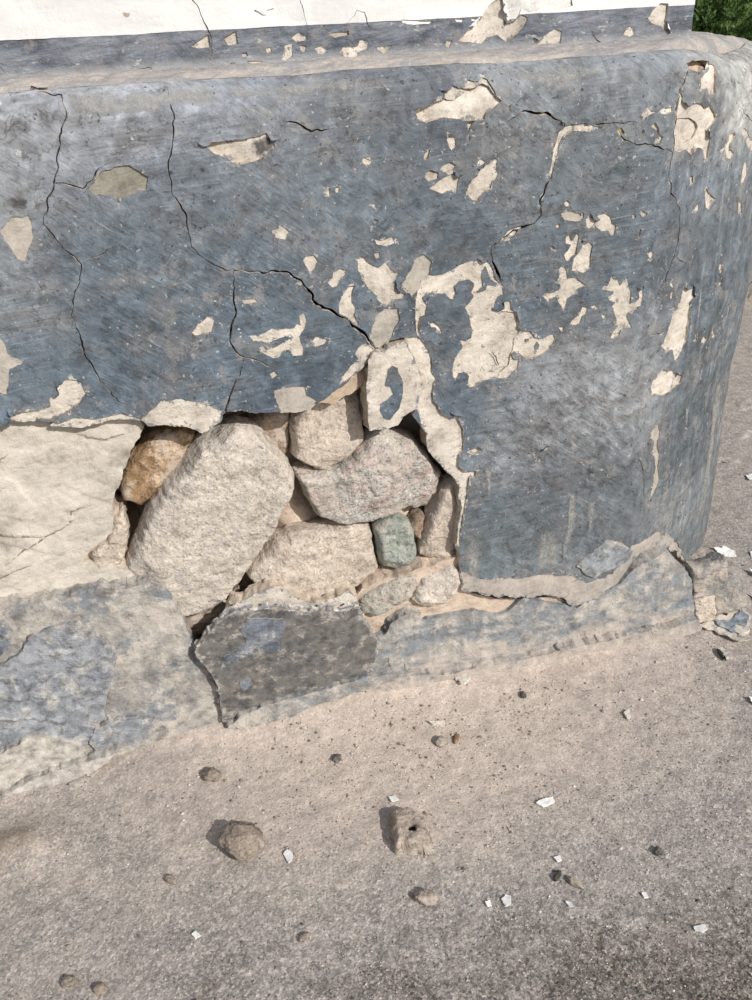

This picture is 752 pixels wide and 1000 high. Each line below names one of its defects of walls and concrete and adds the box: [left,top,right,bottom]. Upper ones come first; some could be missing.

peeling [415,77,501,129]
peeling [641,61,715,158]
crack [30,86,121,403]
crack [167,93,372,412]
peeling [250,314,326,358]
peeling [274,236,644,547]
peeling [651,282,714,395]
crack [0,505,90,579]
flaking render [0,379,223,597]
peeling [458,532,684,607]
flaking render [0,616,155,797]
flaking render [193,578,422,729]